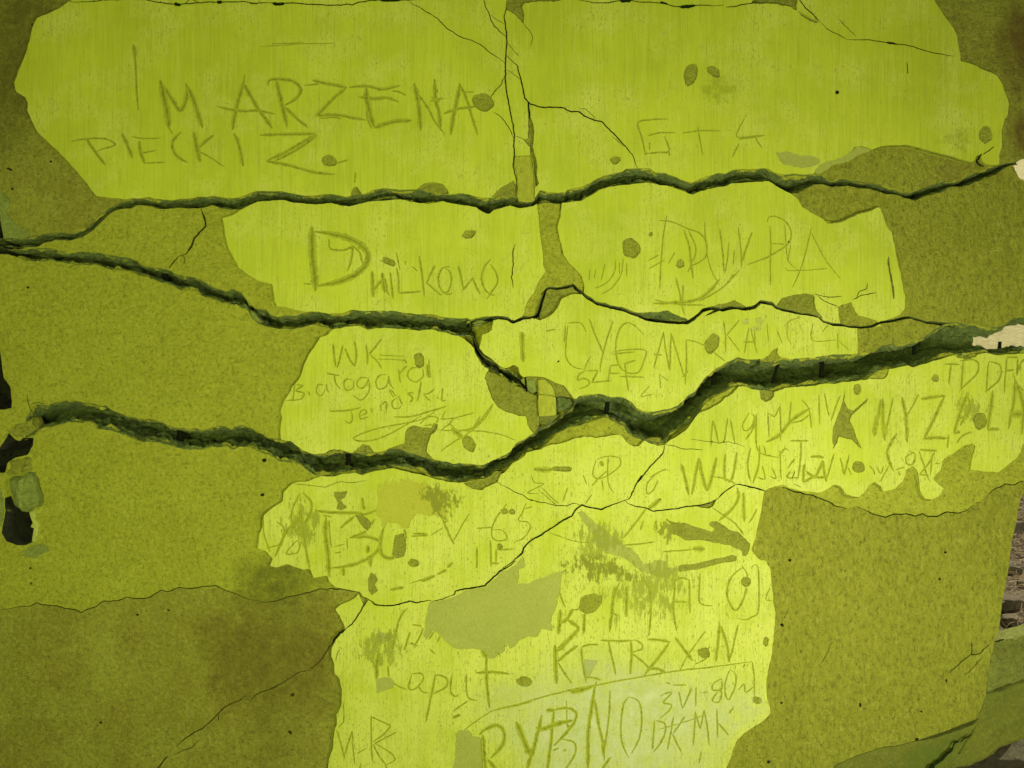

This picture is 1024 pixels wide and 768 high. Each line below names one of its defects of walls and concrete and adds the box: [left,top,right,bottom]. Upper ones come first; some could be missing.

crack [147,0,251,8]
crack [273,0,636,187]
spalling [776,0,1024,355]
spalling [0,0,378,768]
crack [0,147,1024,698]
crack [176,696,245,753]
spalling [423,444,1024,768]